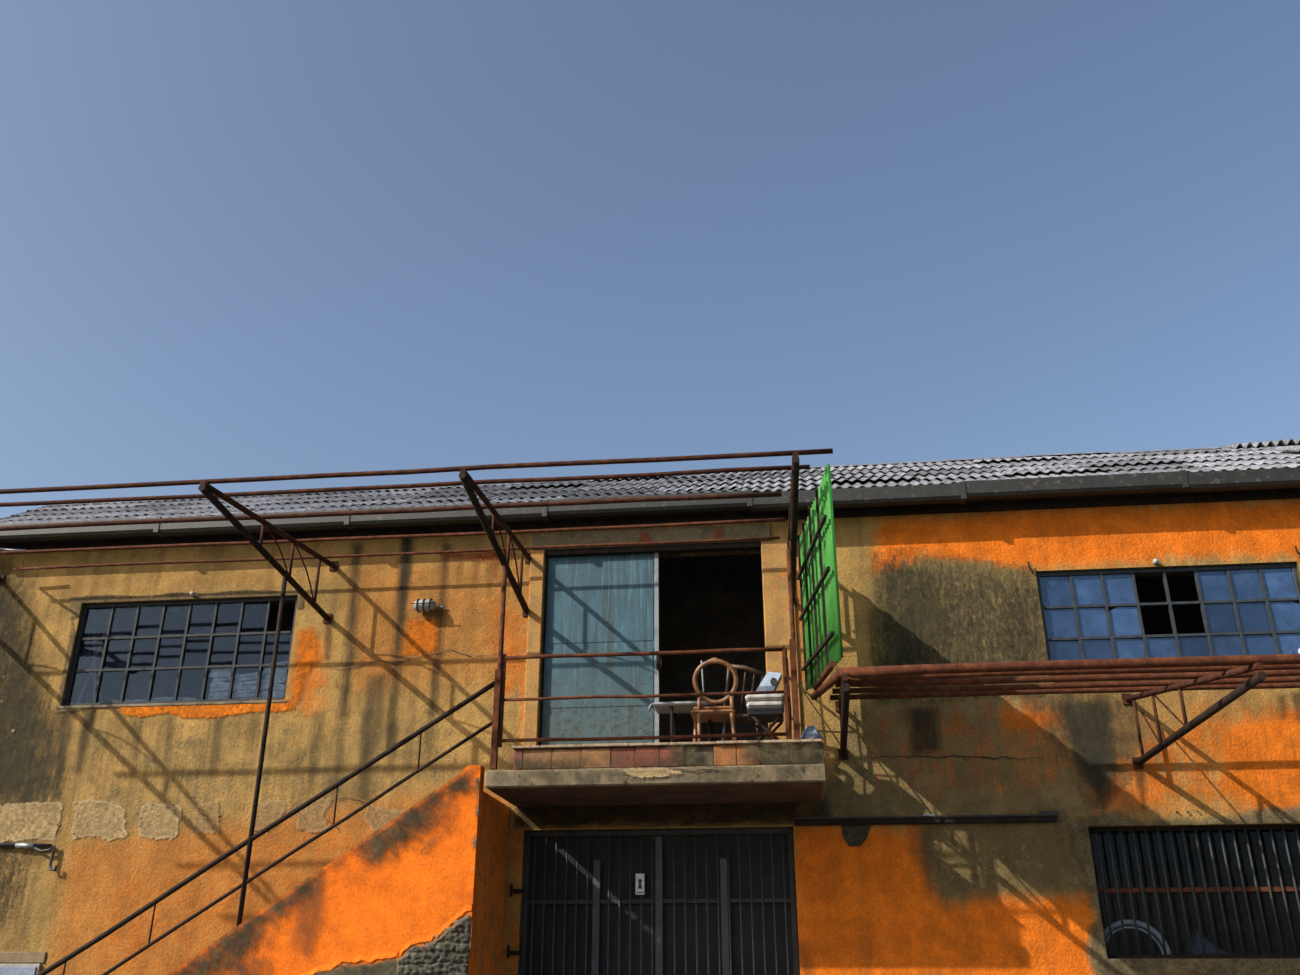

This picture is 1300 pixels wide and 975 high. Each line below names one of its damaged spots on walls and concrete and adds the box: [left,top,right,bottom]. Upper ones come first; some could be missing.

damp [0,580,94,804]
peeling [119,629,319,718]
damp [344,546,360,703]
damp [388,538,410,745]
crack [326,643,510,686]
damp [871,557,1047,697]
damp [1053,695,1119,800]
peeling [0,798,220,843]
peeling [249,796,331,833]
peeling [364,805,405,830]
spalling [300,898,474,975]